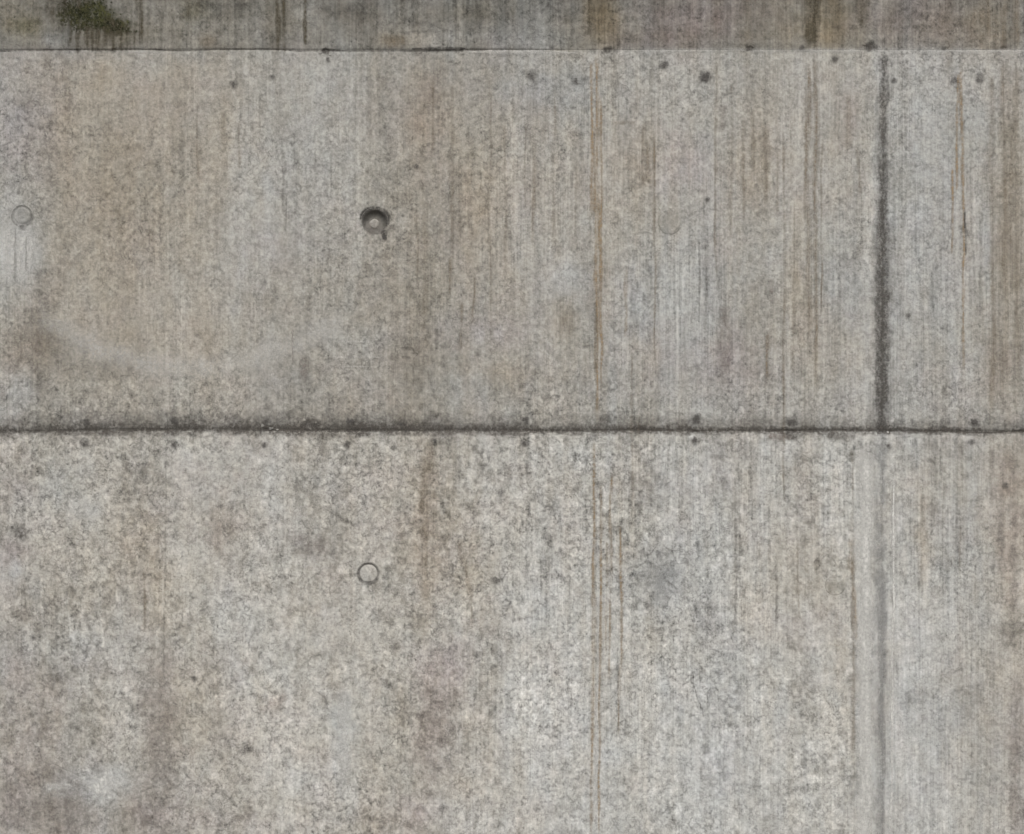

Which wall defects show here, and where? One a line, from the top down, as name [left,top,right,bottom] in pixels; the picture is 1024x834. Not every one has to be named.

leakage [217,124,1024,435]
leakage [0,423,198,434]
corrosion [592,470,602,629]